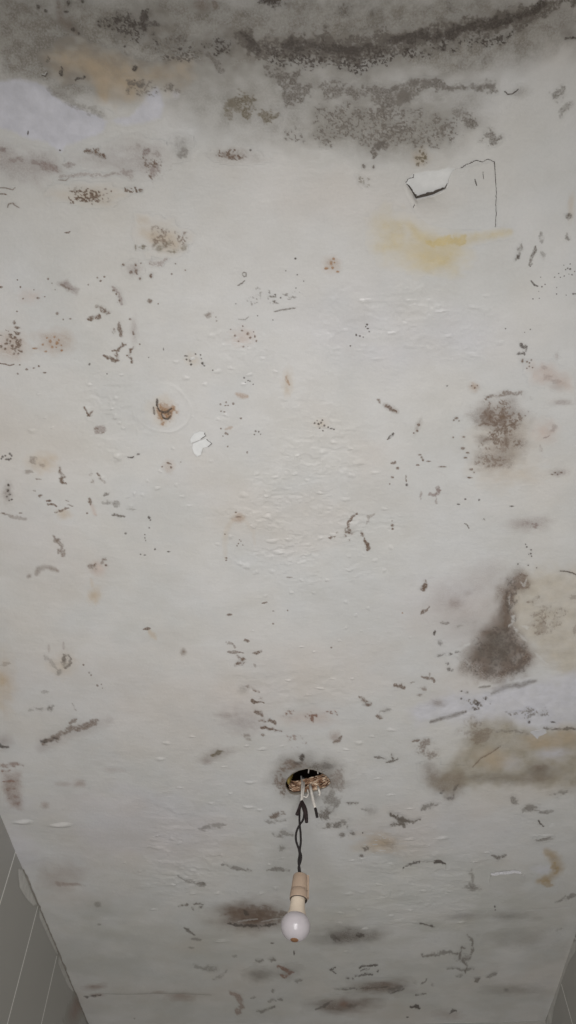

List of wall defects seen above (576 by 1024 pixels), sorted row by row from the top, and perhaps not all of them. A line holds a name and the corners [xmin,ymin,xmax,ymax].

water stain [0,0,576,209]
peeling [403,159,497,229]
water stain [363,200,547,281]
peeling [190,431,212,457]
water stain [192,328,576,859]
spalling [286,769,330,792]
rust [528,846,569,888]
water stain [177,893,394,1016]